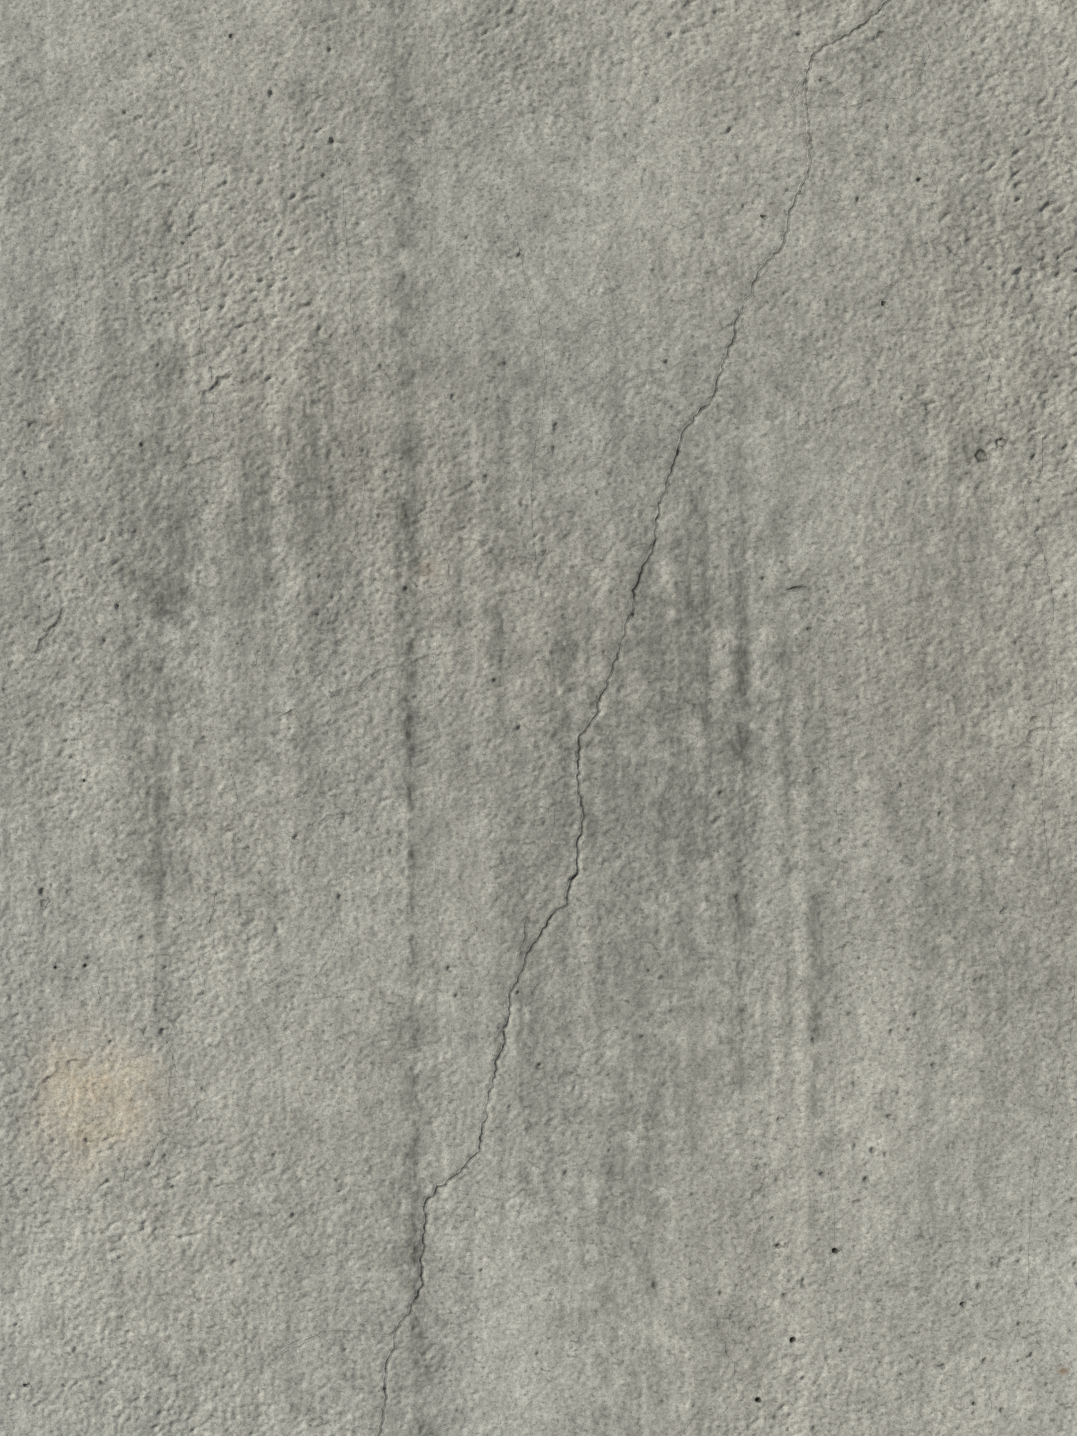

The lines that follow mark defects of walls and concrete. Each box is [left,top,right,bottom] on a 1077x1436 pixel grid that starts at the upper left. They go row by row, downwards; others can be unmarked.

crack [282,0,892,1436]